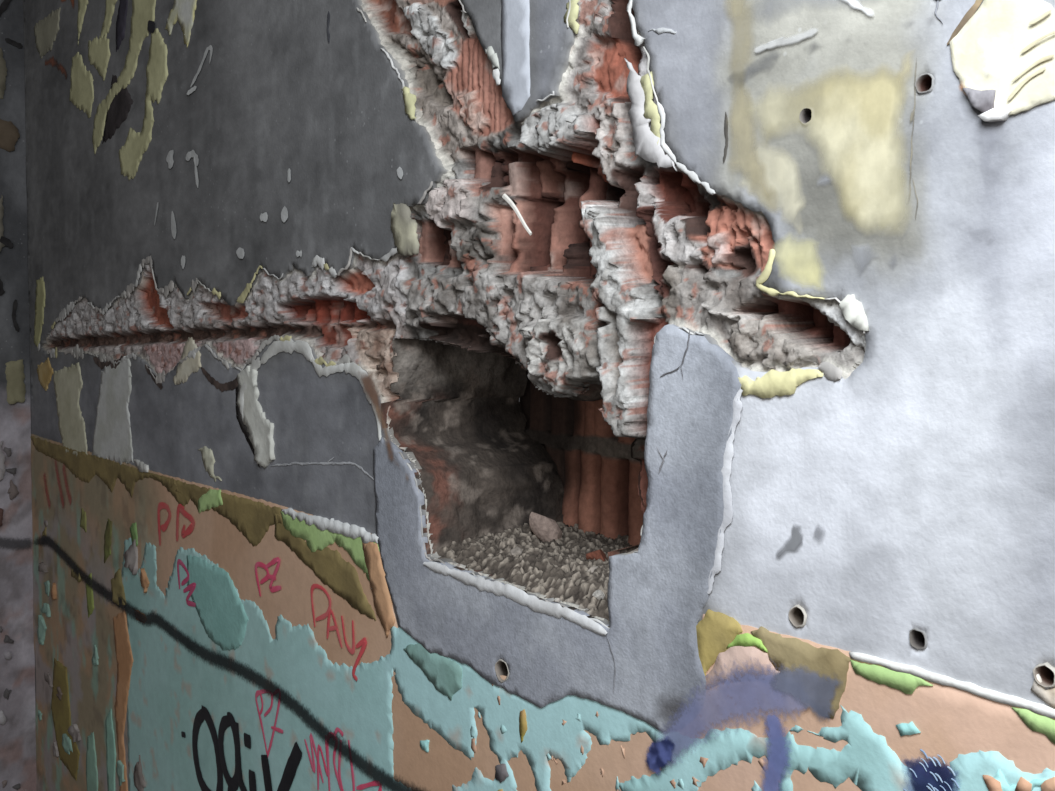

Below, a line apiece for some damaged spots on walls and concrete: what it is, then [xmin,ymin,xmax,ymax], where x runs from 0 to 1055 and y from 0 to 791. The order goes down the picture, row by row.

peeling [34,7,61,59]
leakage [732,56,909,228]
flaking render [950,0,1055,123]
spalling [43,0,869,636]
leakage [775,238,819,285]
peeling [31,355,1055,791]